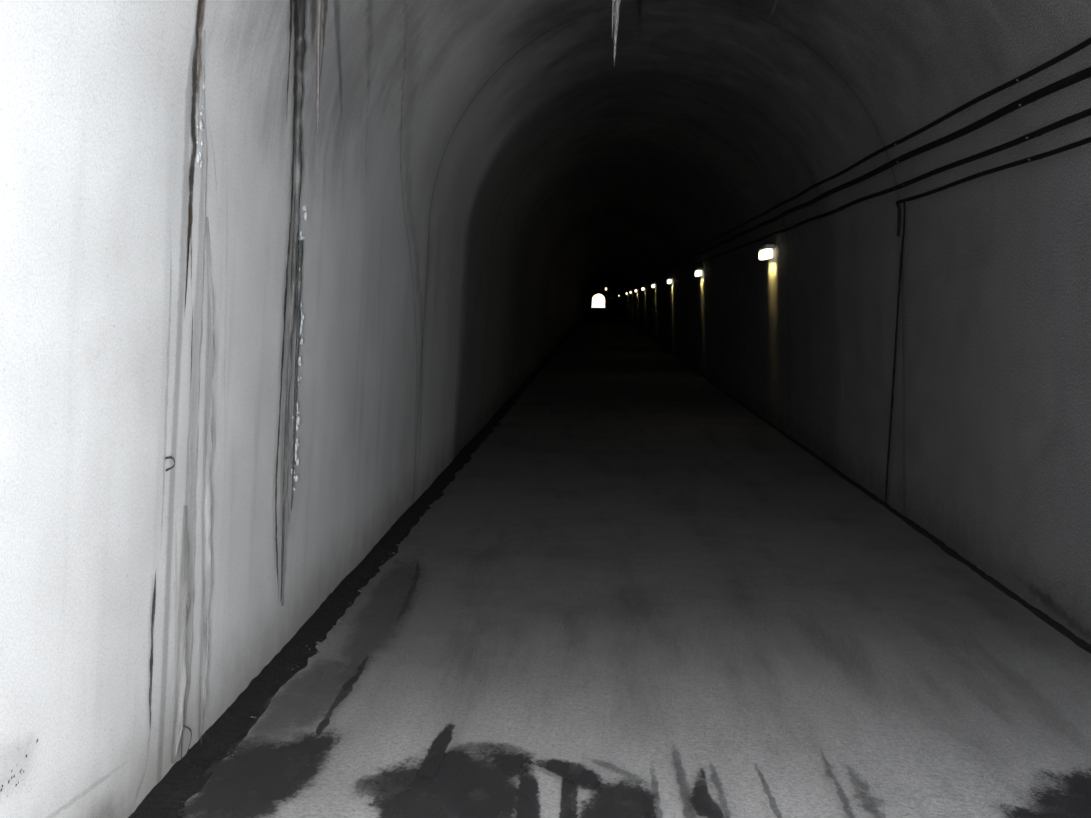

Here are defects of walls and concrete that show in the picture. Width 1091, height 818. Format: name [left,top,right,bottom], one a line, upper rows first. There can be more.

damp [311,0,328,77]
damp [275,0,297,578]
damp [357,724,658,818]
damp [1000,769,1091,818]